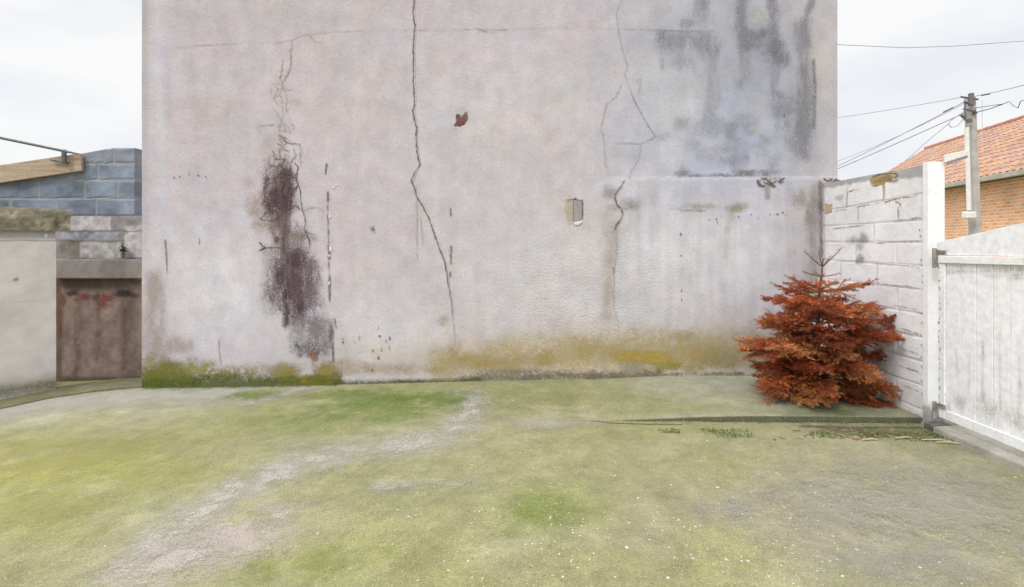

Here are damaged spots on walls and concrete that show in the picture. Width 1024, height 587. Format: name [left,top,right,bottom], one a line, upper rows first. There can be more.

water stain [252,159,333,357]
crack [259,0,676,361]
water stain [677,104,776,198]
water stain [737,0,816,157]
water stain [795,182,825,276]